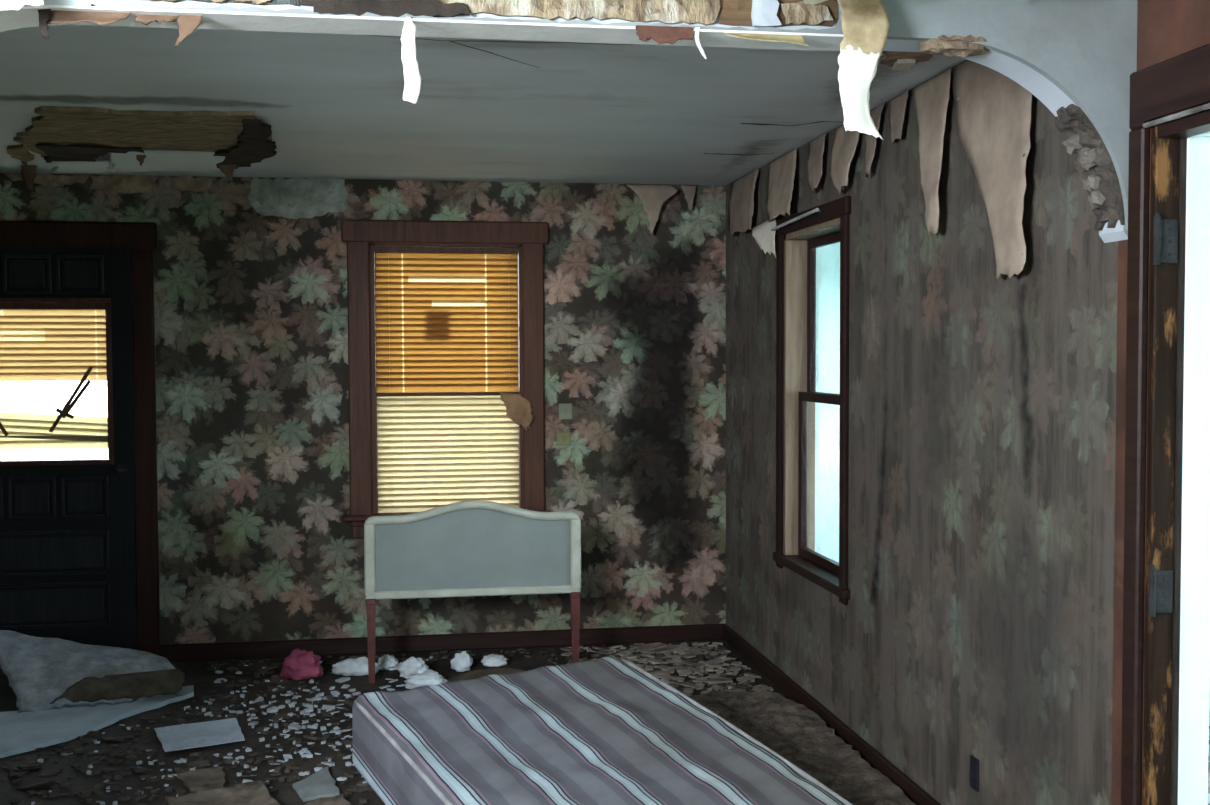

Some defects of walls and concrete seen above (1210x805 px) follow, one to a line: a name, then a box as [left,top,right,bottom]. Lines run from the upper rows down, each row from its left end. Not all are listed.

spalling [38,0,838,104]
spalling [7,106,277,191]
spalling [1054,104,1125,231]